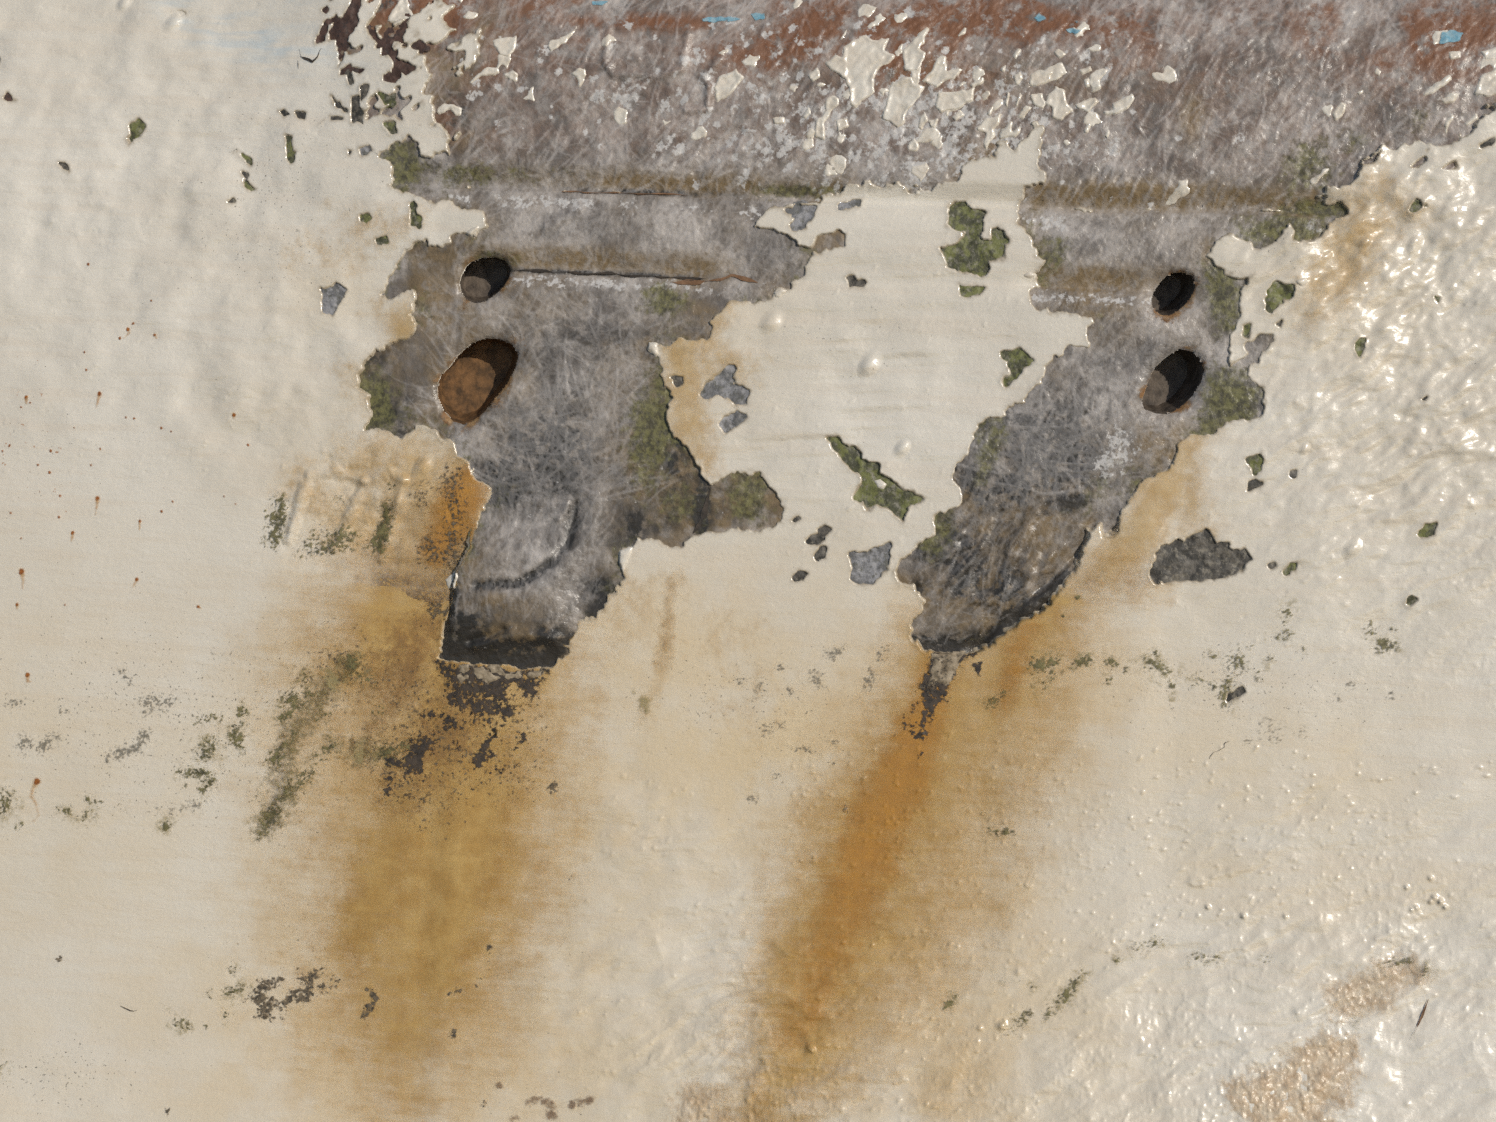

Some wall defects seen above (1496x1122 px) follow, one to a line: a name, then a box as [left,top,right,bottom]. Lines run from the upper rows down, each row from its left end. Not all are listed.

peeling [315,0,1496,670]
leakage [16,734,62,752]
leakage [106,669,177,762]
leakage [193,706,249,762]
leakage [296,624,558,839]
corrosion [343,456,548,1061]
corrosion [760,594,1077,1105]
peeling [1227,686,1245,702]